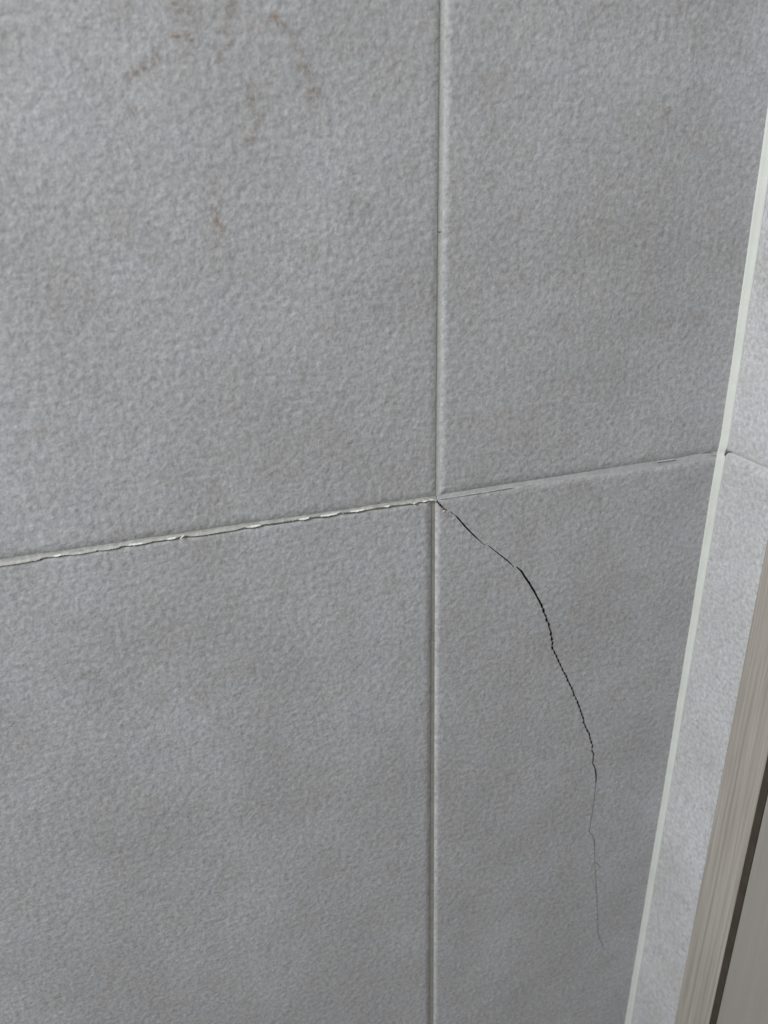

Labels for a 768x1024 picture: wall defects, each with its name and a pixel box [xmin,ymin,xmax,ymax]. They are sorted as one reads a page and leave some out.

crack [437,501,604,949]